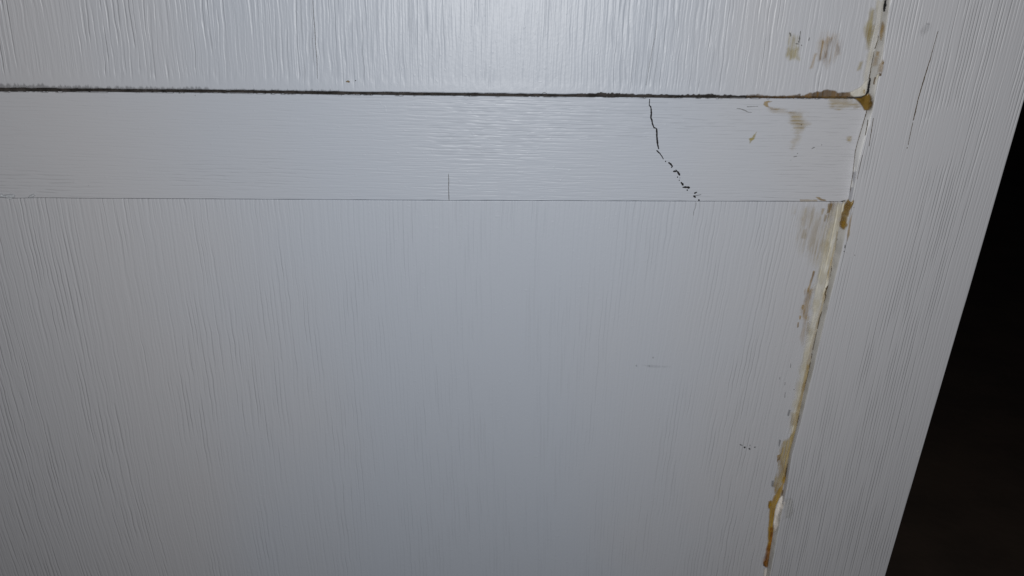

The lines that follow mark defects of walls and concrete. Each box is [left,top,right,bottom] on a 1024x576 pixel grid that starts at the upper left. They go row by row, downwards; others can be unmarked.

peeling [851,35,884,97]
crack [649,99,700,216]
peeling [791,202,844,434]
peeling [773,489,788,532]